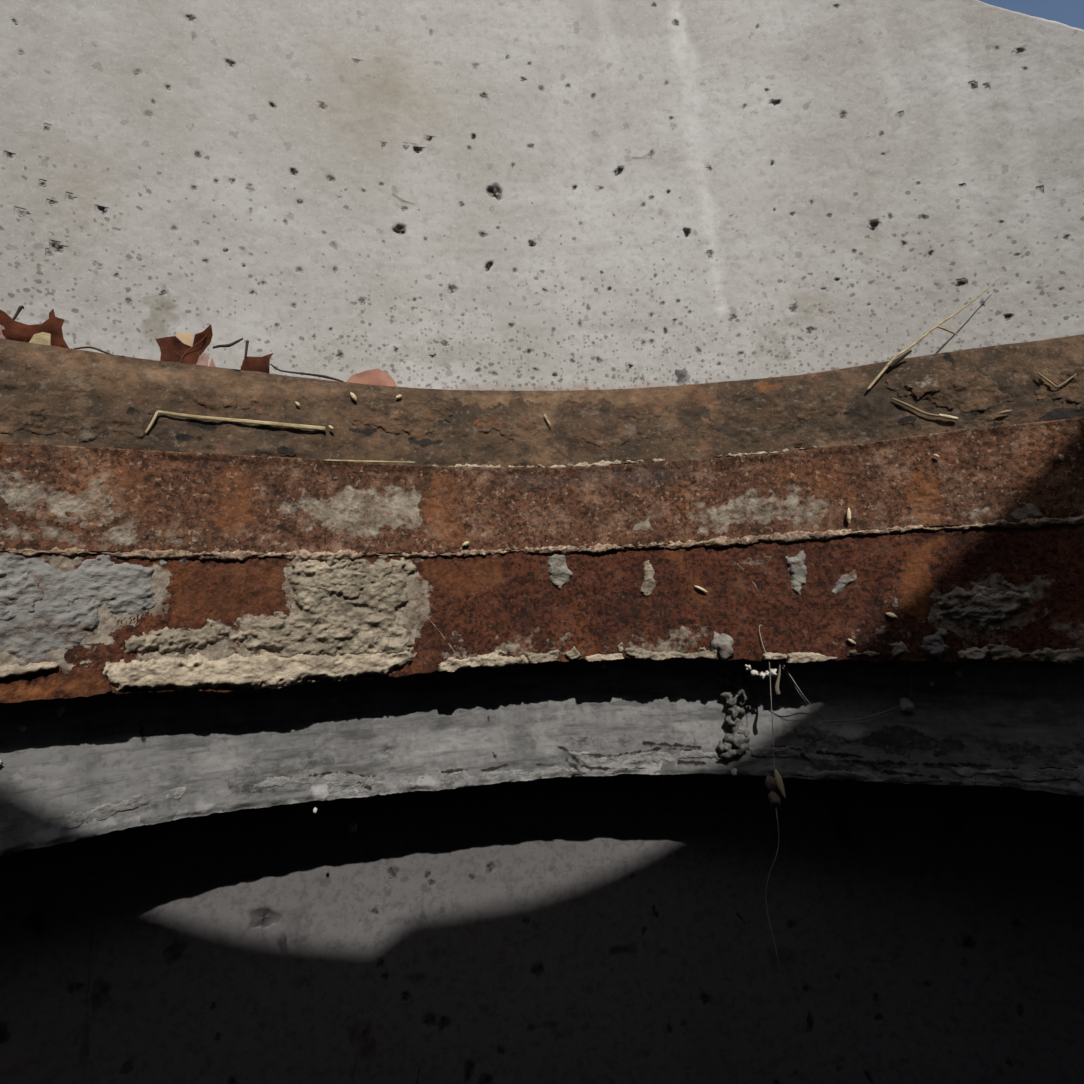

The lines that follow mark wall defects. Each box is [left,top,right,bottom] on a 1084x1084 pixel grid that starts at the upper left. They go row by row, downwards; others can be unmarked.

corrosion [423,377,668,391]
corrosion [753,374,807,393]
corrosion [417,467,519,605]
peeling [0,569,45,621]
corrosion [165,558,291,630]
peeling [299,555,393,600]
corrosion [658,548,720,618]
corrosion [893,530,948,622]
peeling [0,662,59,679]
corrosion [0,657,112,703]
peeling [103,646,417,695]
peeling [749,744,1027,788]